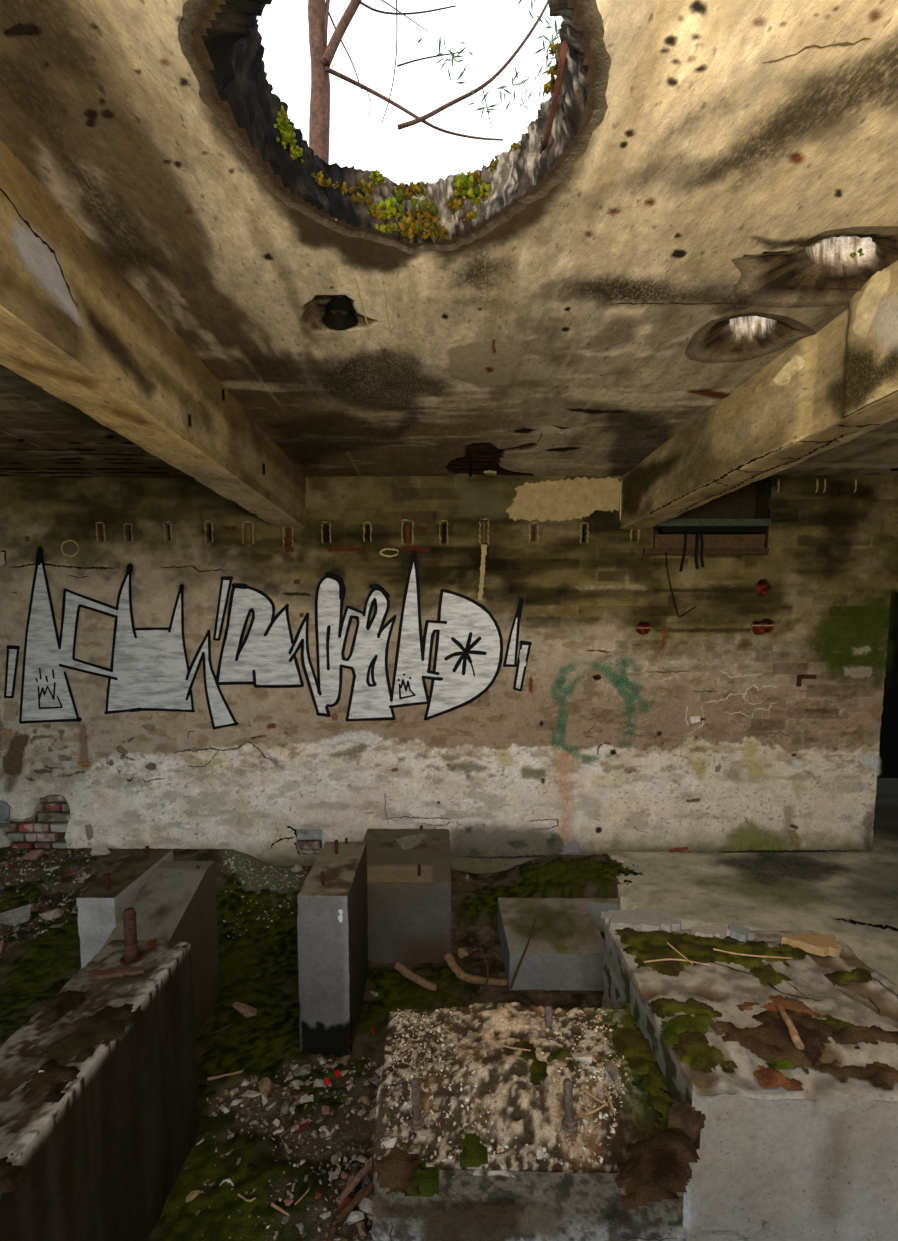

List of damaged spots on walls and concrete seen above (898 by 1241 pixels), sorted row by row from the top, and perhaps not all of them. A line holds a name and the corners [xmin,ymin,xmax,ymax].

crack [764,37,870,63]
spalling [177,0,611,254]
spalling [284,286,394,339]
spalling [684,226,898,363]
leakage [257,352,450,466]
flaking render [0,724,84,849]